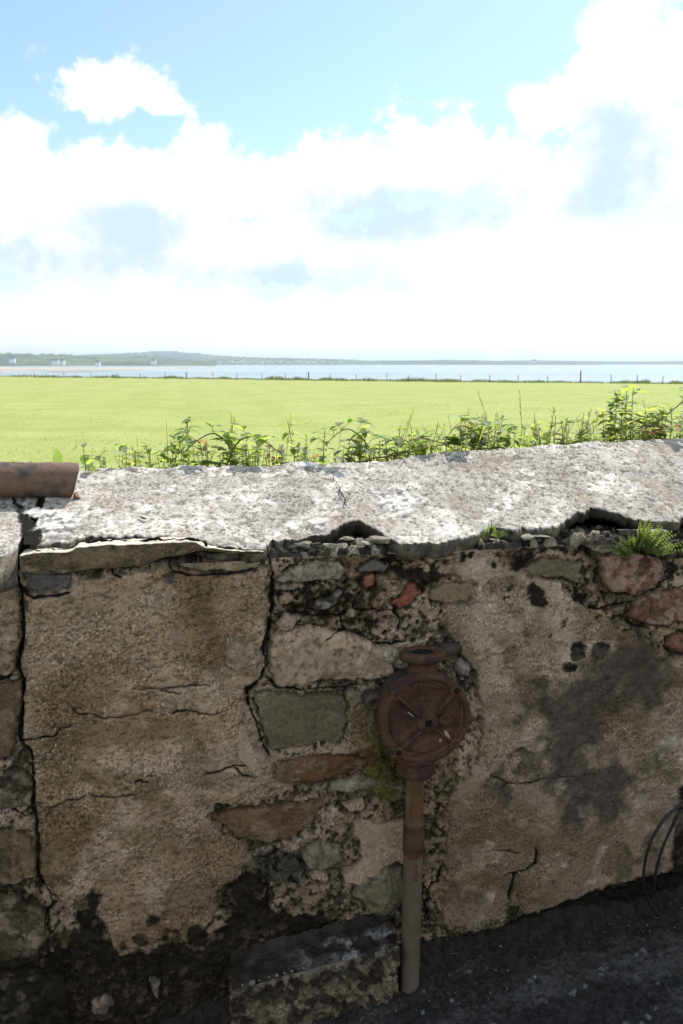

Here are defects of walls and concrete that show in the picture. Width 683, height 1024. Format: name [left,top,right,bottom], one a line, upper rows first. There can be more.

spalling [266,535,394,563]
spalling [477,525,683,554]
flaking render [276,591,296,631]
crack [0,497,407,945]
leakage [518,634,674,830]
spalling [253,845,328,884]
flaking render [340,797,403,886]
crack [487,847,537,901]
leakage [0,871,336,1024]